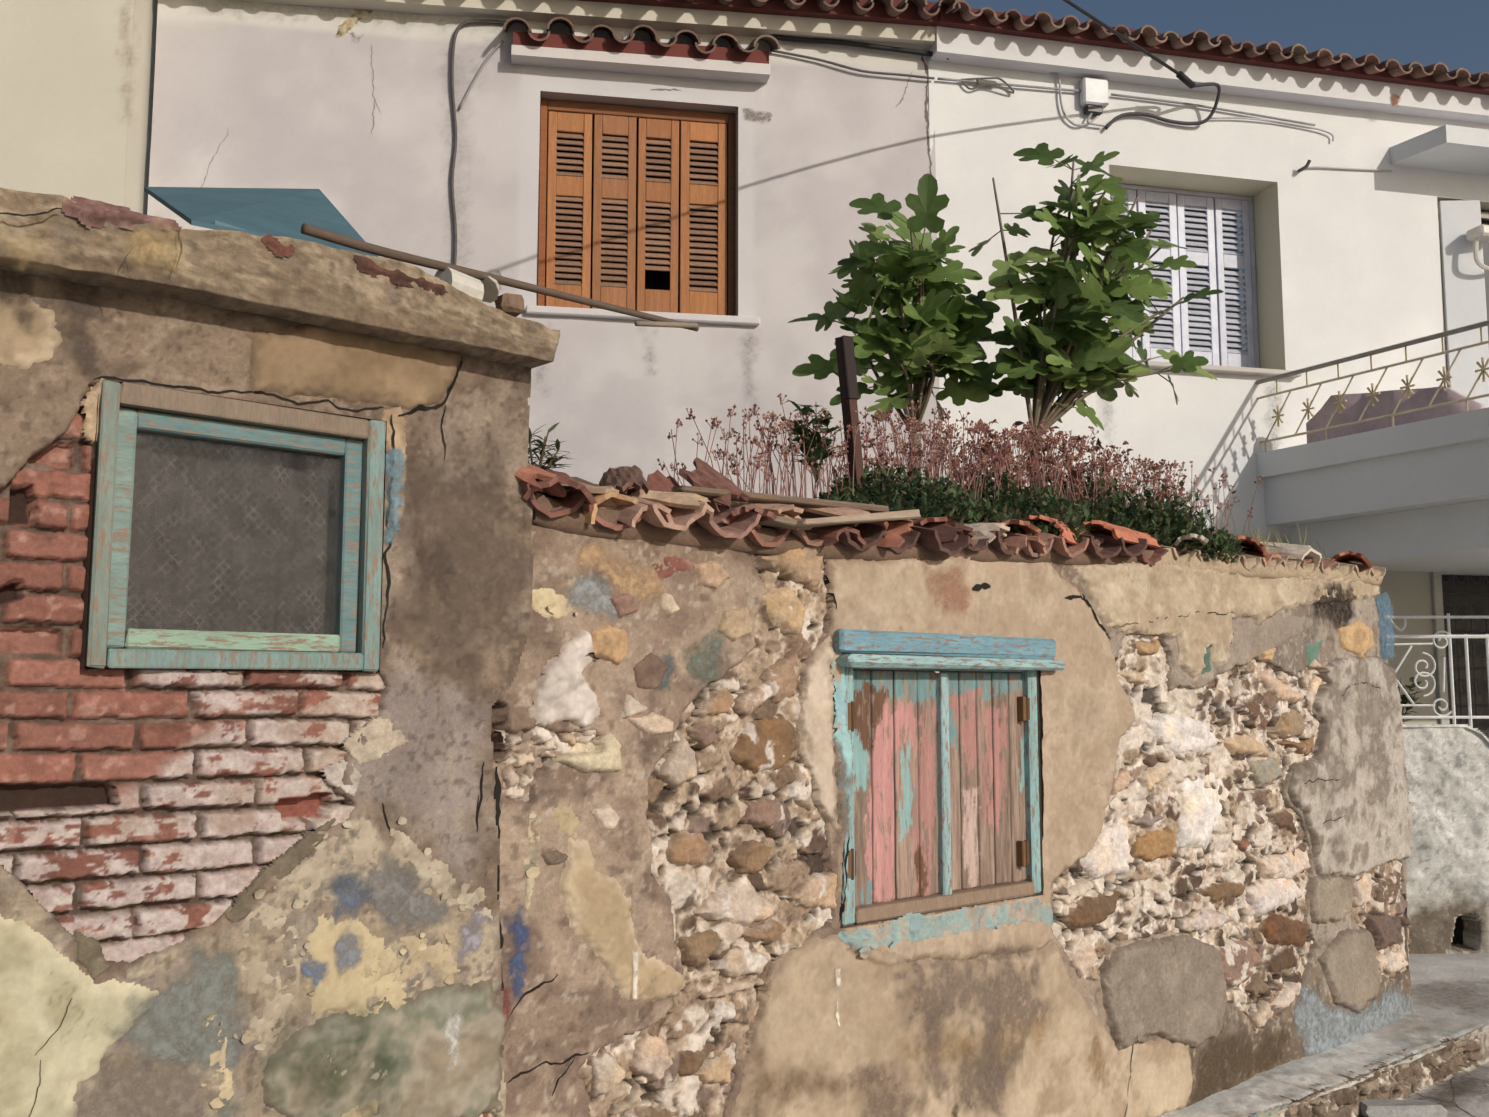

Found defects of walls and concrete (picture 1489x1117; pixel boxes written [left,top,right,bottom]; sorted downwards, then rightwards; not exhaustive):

spalling [62,196,181,232]
spalling [262,234,295,258]
spalling [354,255,448,295]
crack [93,357,463,649]
spalling [0,378,1415,1117]
crack [476,762,558,1015]
leakage [895,948,1047,1117]
crack [508,1052,589,1096]
leakage [859,1068,909,1117]
spalling [1250,1038,1481,1117]